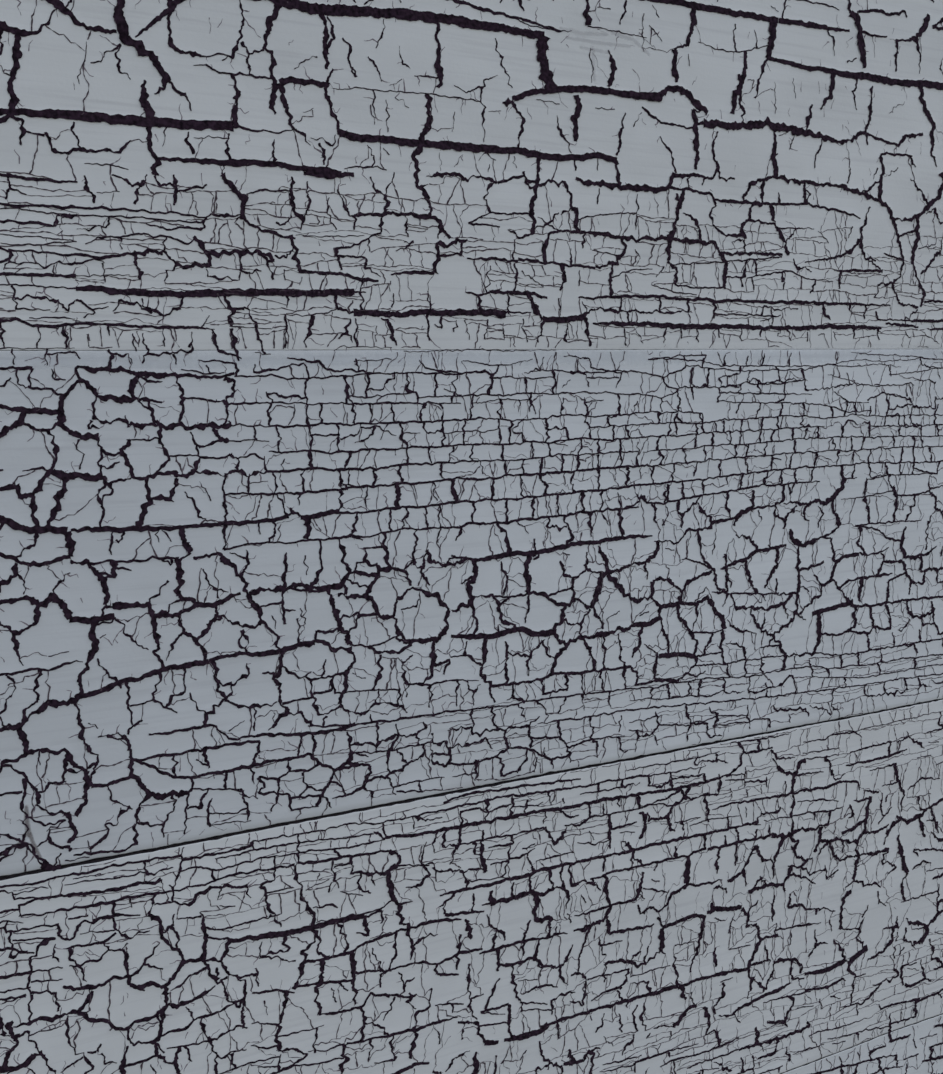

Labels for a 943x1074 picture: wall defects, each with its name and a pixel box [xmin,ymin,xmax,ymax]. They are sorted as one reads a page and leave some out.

crack [619,0,633,24]
crack [342,38,357,77]
crack [495,38,513,88]
crack [846,0,908,68]
crack [890,14,943,74]
crack [51,368,66,381]
crack [913,840,943,856]
crack [912,860,943,888]
crack [877,887,897,924]
crack [87,1044,116,1073]
crack [903,1032,943,1074]